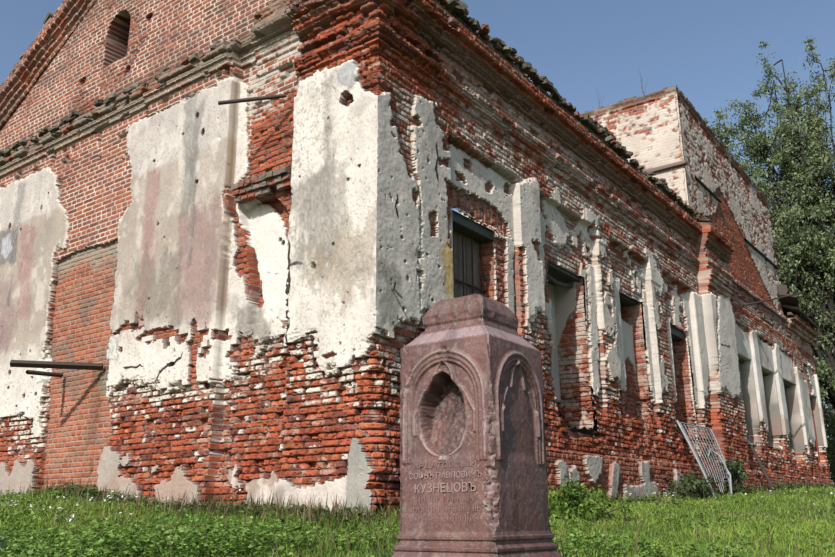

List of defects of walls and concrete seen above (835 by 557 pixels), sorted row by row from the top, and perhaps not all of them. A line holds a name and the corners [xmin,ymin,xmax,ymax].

crack [433,143,441,182]
flaking render [0,167,70,496]
crack [123,354,182,383]
crack [285,240,316,369]
spalling [96,59,833,519]